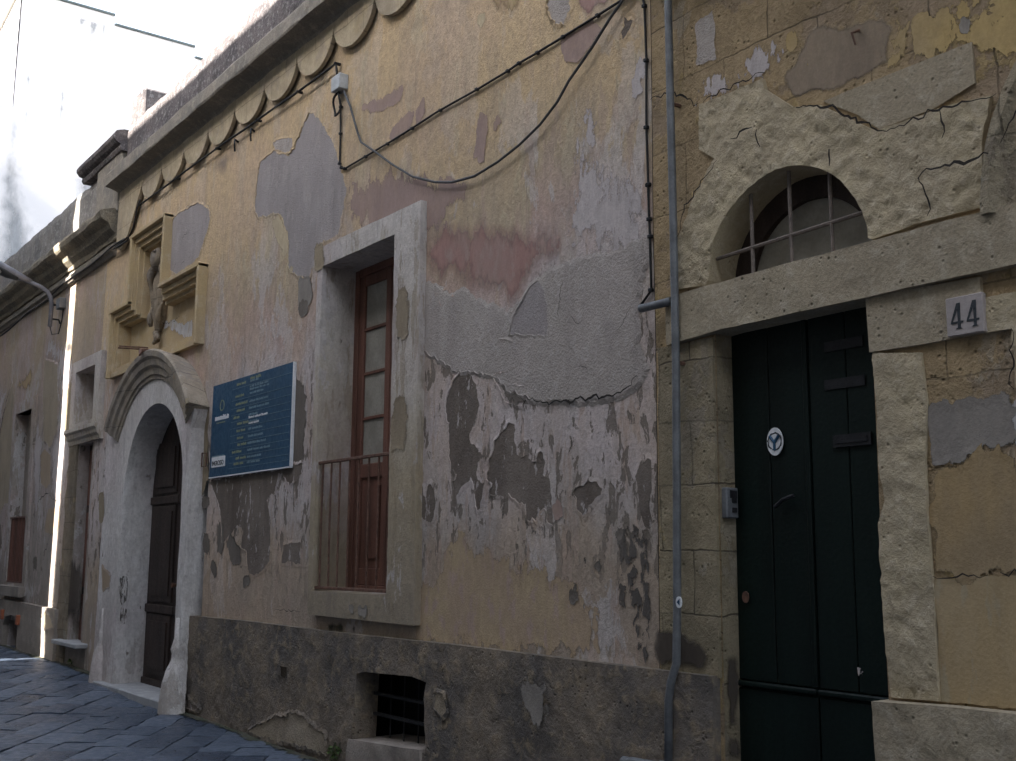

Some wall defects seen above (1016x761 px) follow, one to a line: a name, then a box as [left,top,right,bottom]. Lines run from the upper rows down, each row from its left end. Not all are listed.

peeling [545,0,607,63]
peeling [362,85,403,114]
flaking render [695,31,801,106]
peeling [473,112,502,164]
damp [5,203,22,261]
flaking render [170,201,211,275]
flaking render [254,110,348,317]
flaking render [498,276,549,343]
flaking render [615,525,651,663]